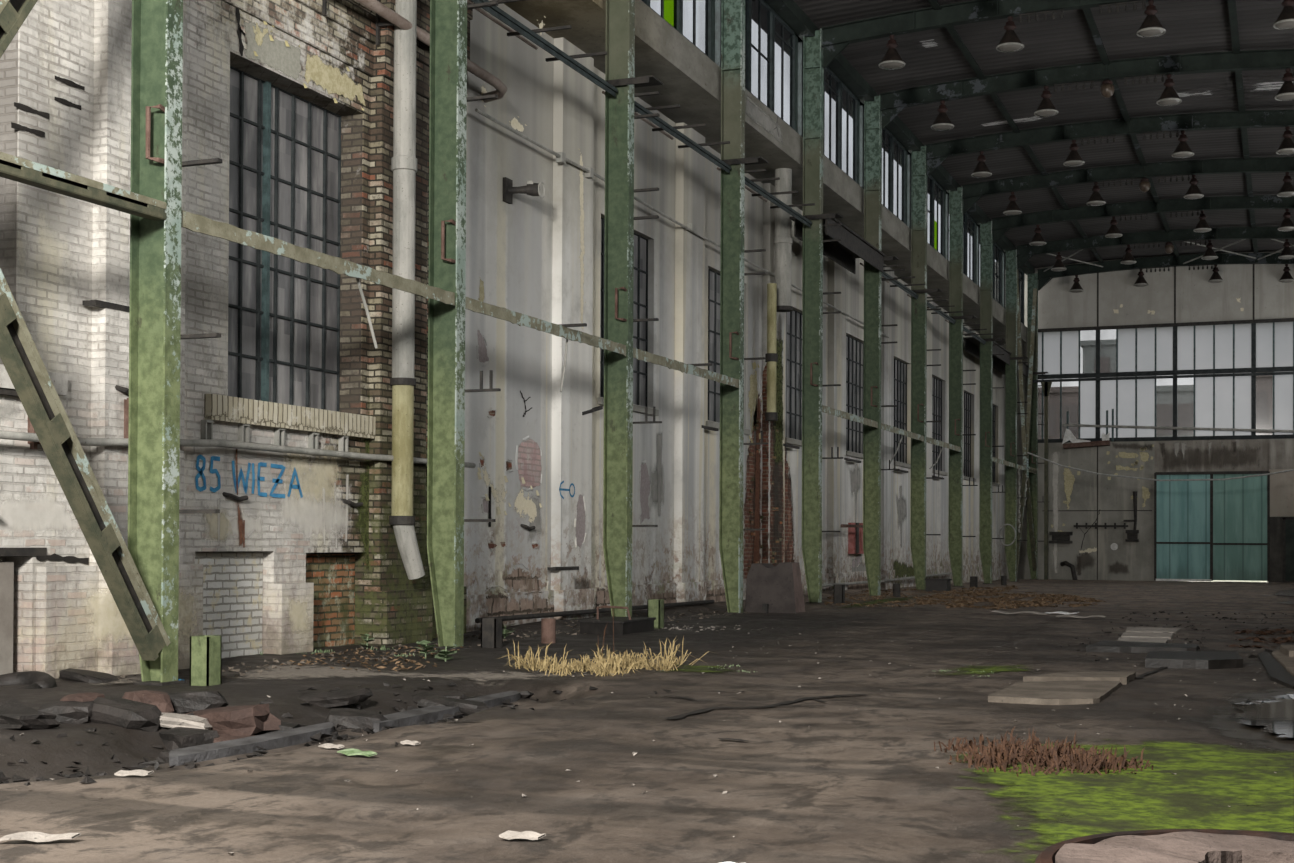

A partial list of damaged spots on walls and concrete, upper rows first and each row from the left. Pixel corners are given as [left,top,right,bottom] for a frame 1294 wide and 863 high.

peeling [244,21,365,110]
flaking render [506,436,543,523]
flaking render [743,362,795,597]
peeling [1106,444,1154,507]
flaking render [481,487,507,552]
flaking render [574,494,587,549]
flaking render [485,563,554,626]